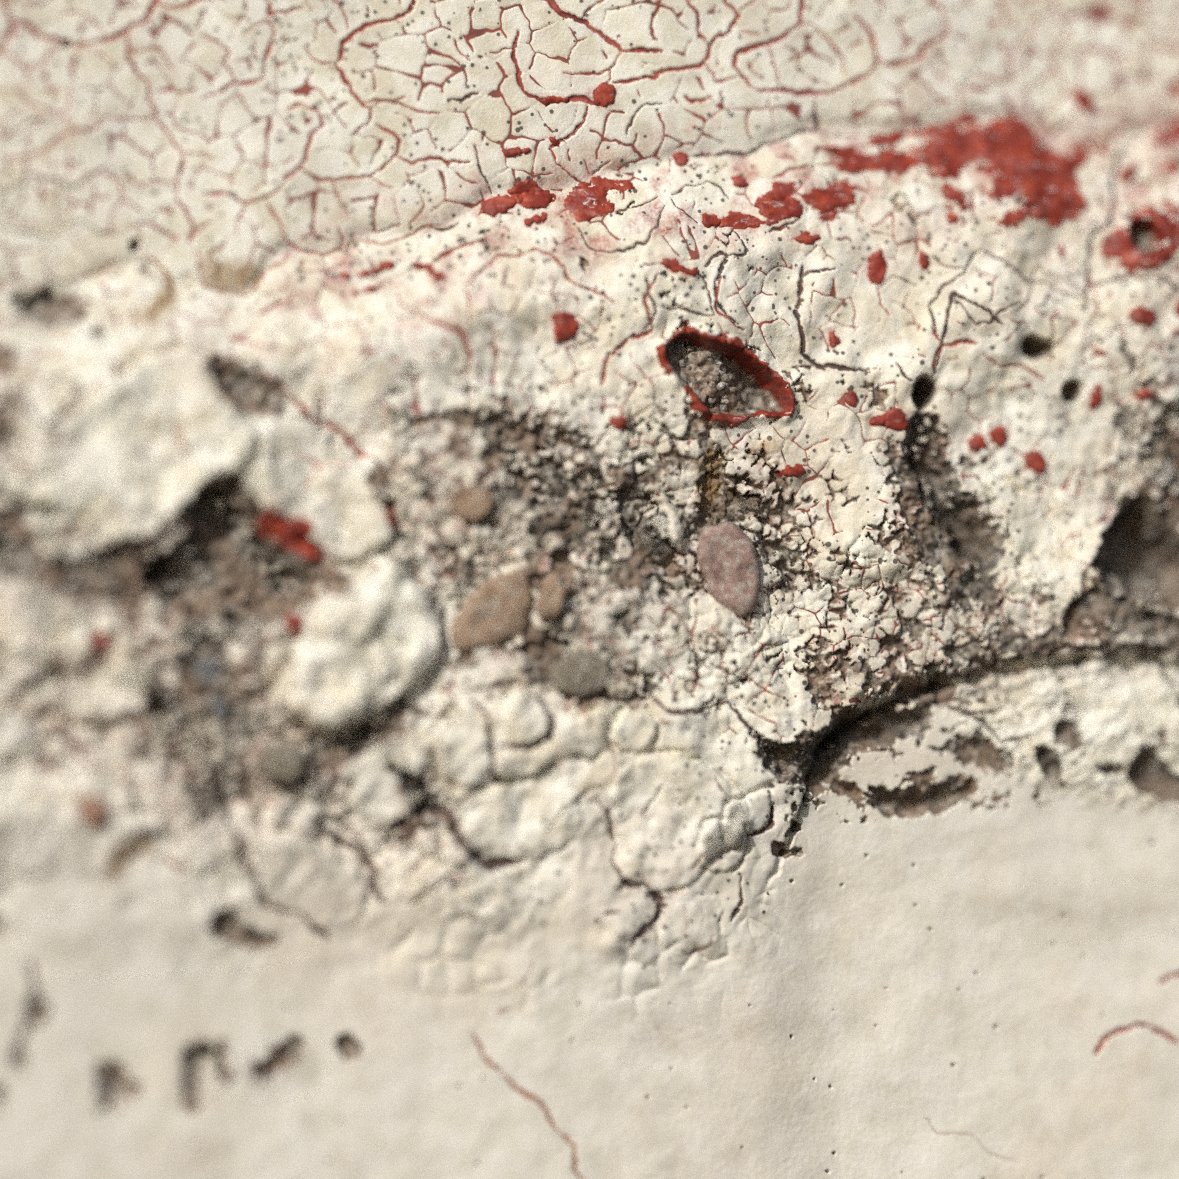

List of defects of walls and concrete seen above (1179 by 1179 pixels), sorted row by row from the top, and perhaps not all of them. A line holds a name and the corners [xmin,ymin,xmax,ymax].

peeling [719,111,1096,233]
crack [0,0,1179,595]
spalling [461,396,693,601]
spalling [878,411,1006,615]
spalling [1061,399,1179,652]
spalling [0,472,324,825]
crack [227,627,388,905]
crack [391,555,1179,956]
spalling [756,702,1016,820]
crack [471,1033,584,1179]
crack [1094,1022,1179,1055]
crack [1159,973,1179,984]